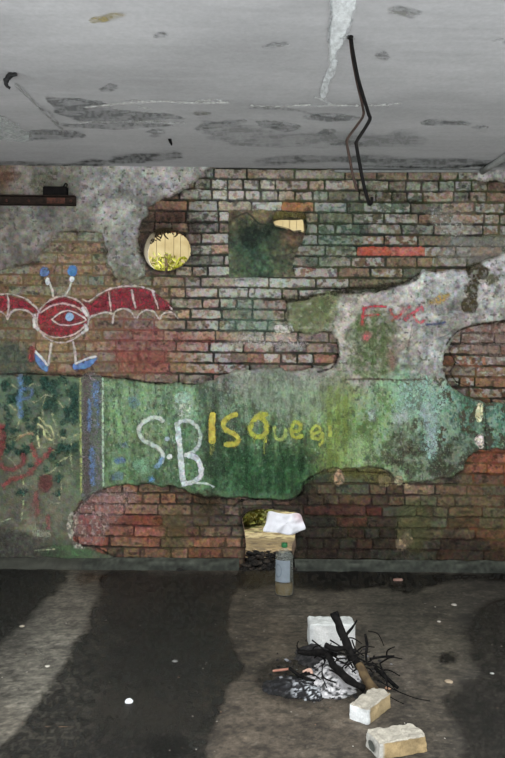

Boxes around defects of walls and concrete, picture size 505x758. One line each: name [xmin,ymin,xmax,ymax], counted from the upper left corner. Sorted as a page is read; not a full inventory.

water stain [300,0,356,107]
water stain [111,154,160,163]
flaking render [0,167,505,497]
flaking render [70,436,505,568]